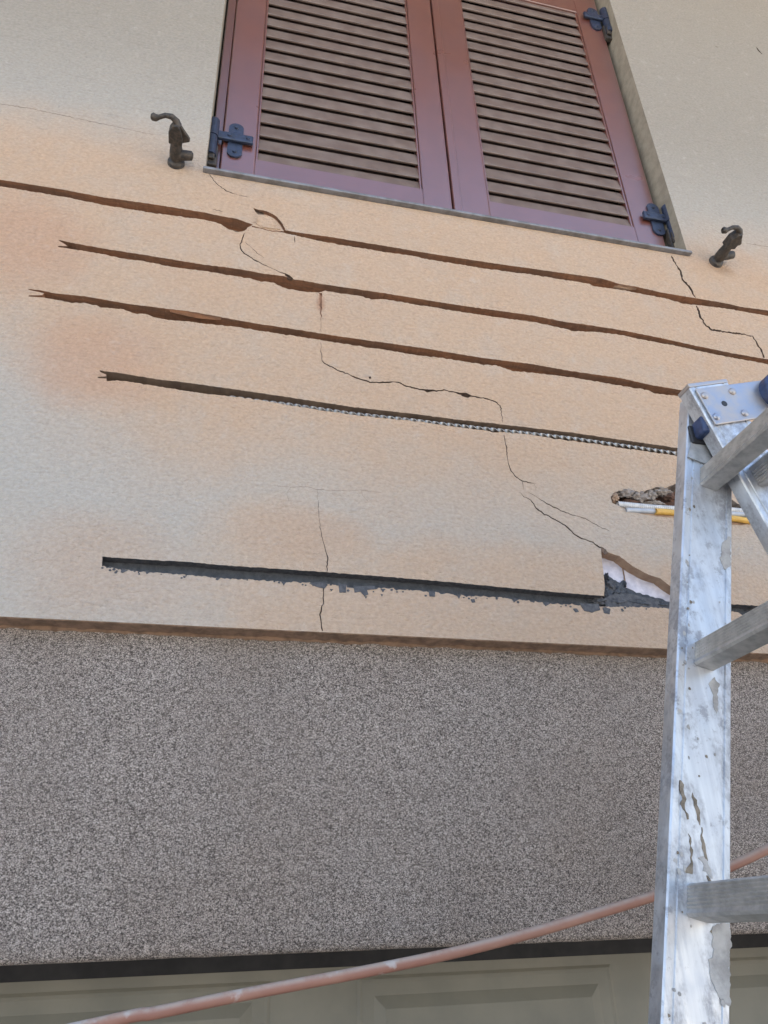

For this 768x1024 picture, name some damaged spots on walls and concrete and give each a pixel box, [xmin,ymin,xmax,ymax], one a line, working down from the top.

crack [240,234,293,280]
crack [316,293,324,320]
crack [671,256,765,358]
crack [320,350,607,548]
crack [316,489,371,631]
flaking render [591,547,670,608]